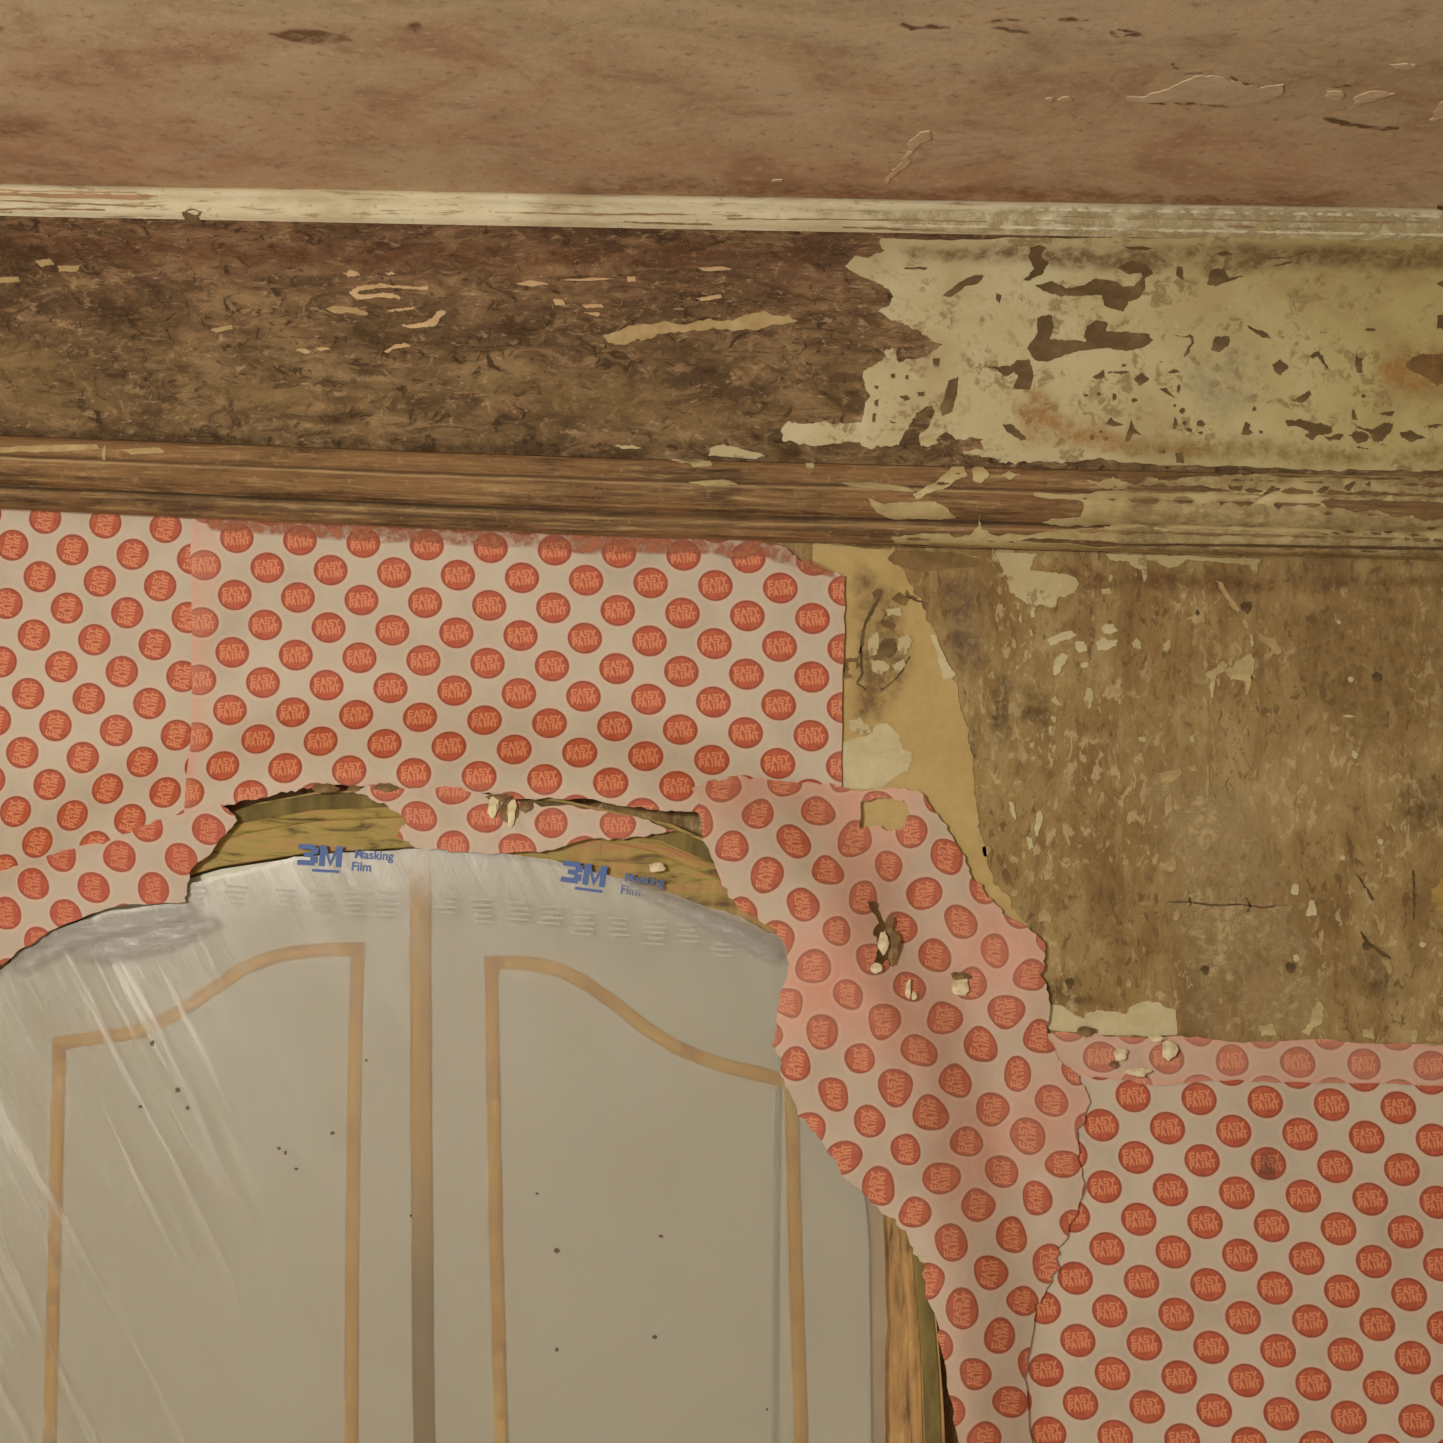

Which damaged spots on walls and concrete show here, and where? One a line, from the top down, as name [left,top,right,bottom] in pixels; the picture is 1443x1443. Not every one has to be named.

peeling [781,237,1443,930]
peeling [867,901,899,966]
peeling [1046,1001,1178,1036]
peeling [1259,1024,1276,1036]
peeling [1302,1001,1325,1036]